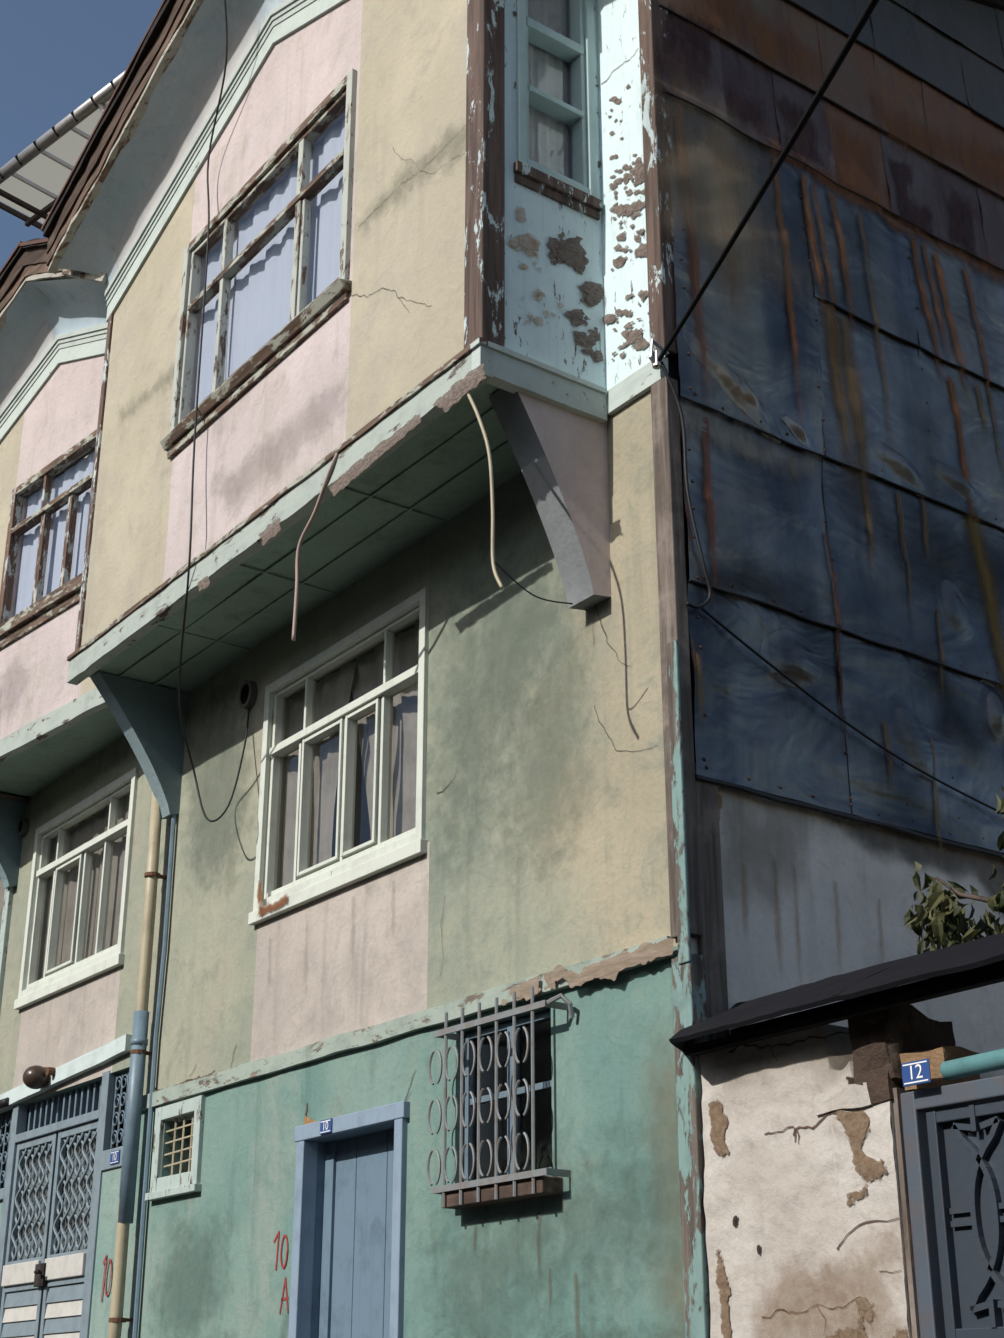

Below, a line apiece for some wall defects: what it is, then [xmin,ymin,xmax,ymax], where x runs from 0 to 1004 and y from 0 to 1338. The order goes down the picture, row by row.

peeling [598,84,647,271]
crack [352,287,432,312]
peeling [508,207,649,363]
rust [773,155,798,382]
rust [801,176,873,557]
peeling [329,414,421,496]
rust [890,158,1004,692]
peeling [501,938,674,1006]
flaking render [708,1100,729,1157]
crack [764,1112,837,1144]
flaking render [836,1109,887,1207]
flaking render [716,1249,731,1338]